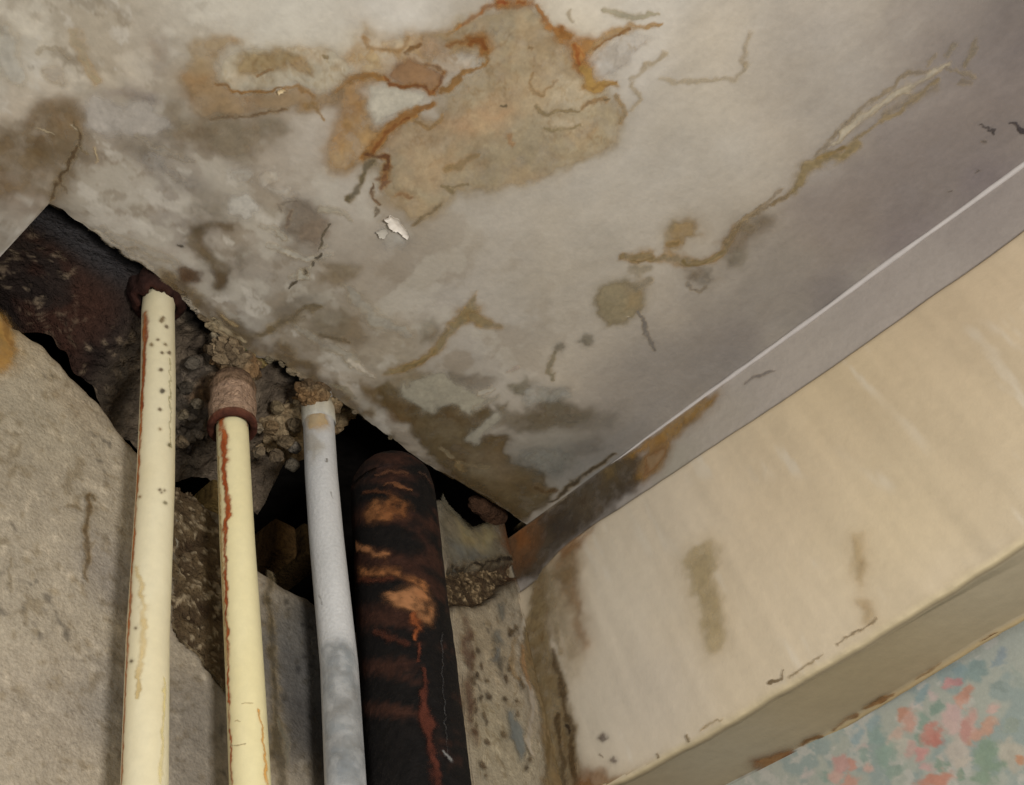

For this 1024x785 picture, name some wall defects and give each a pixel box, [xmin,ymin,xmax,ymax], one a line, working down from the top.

crack [50,122,88,202]
damp [0,37,352,290]
damp [595,42,976,351]
spalling [0,203,540,770]
damp [258,297,642,785]
rust [628,396,716,480]